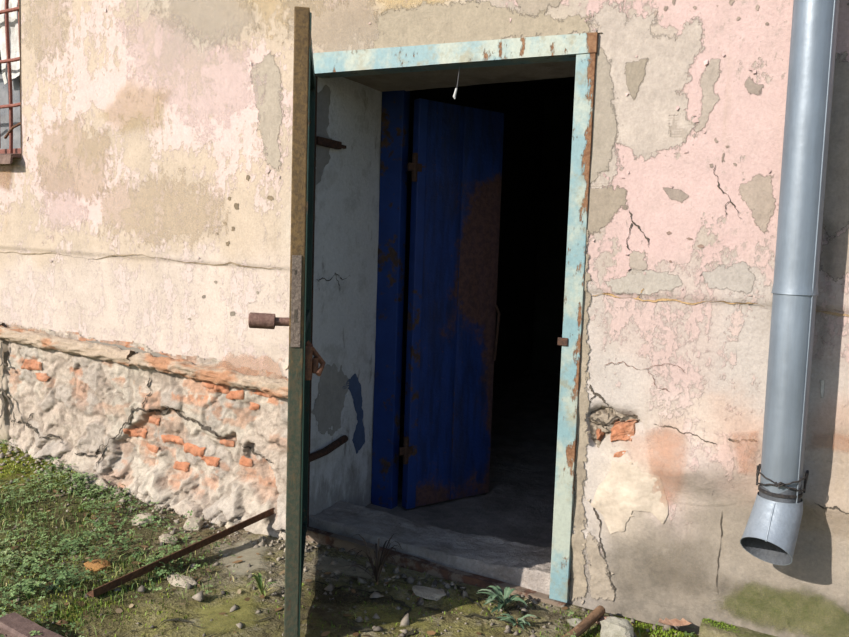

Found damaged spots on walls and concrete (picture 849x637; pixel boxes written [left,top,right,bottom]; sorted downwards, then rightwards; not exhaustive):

peeling [248,52,285,178]
crack [713,165,740,218]
peeling [819,44,849,285]
crack [98,254,272,269]
crack [626,212,649,250]
peeling [368,0,725,605]
crack [0,342,272,467]
spalling [0,322,288,540]
peeling [311,363,349,436]
crack [604,361,684,391]
crack [588,385,755,445]
crack [815,503,849,514]